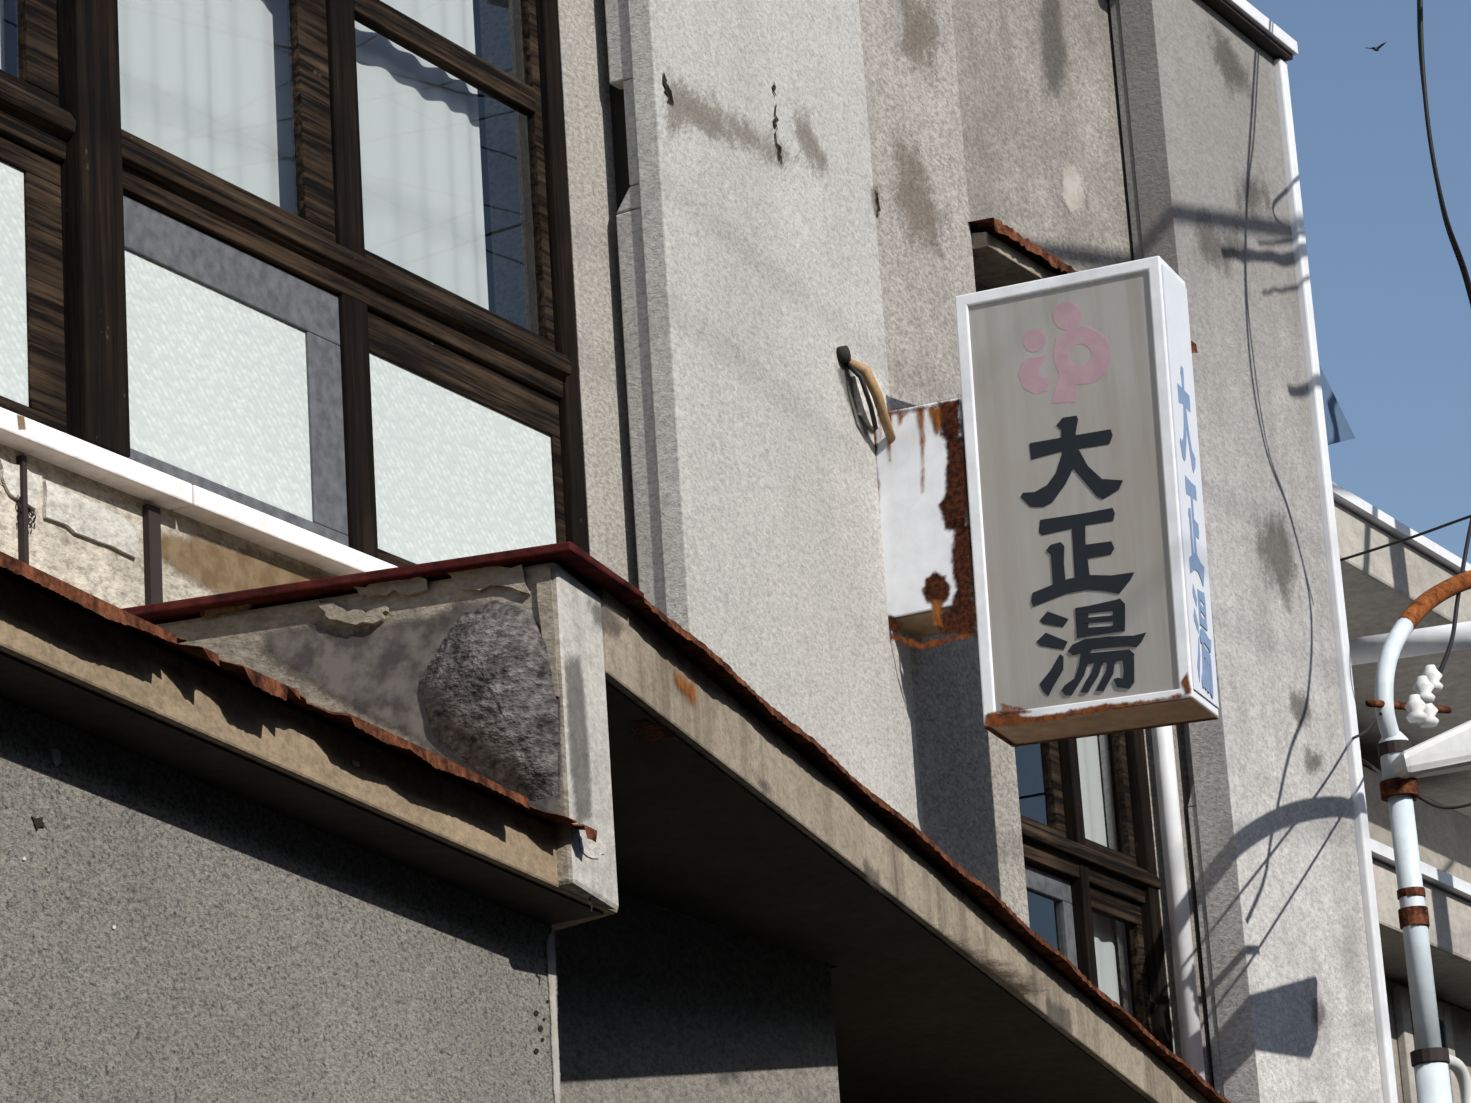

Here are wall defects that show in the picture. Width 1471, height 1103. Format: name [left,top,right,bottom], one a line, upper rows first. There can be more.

peeling [0,458,141,559]